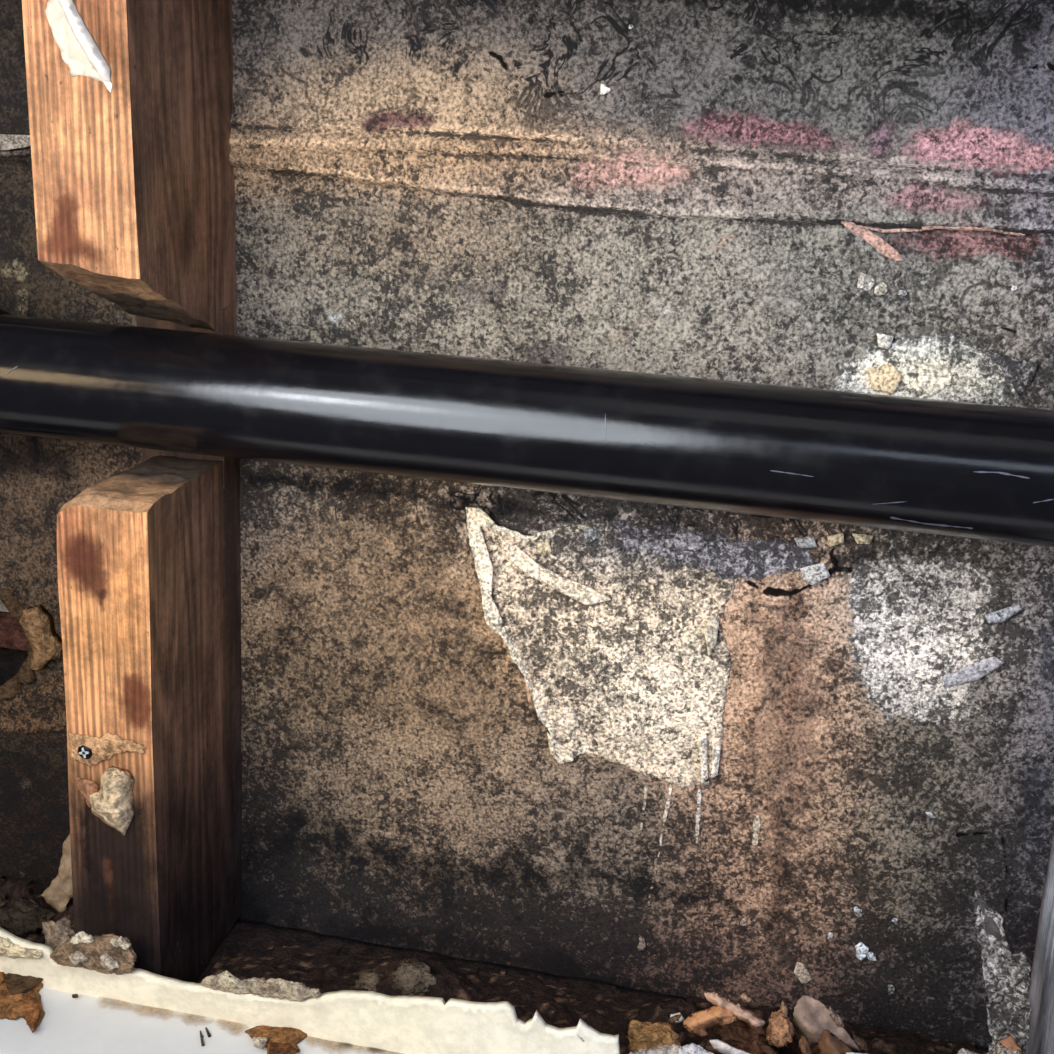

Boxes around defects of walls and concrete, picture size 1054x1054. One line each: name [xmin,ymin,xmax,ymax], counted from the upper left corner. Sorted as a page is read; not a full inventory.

peeling [2,259,30,316]
damp [65,536,106,604]
crack [746,547,854,597]
spalling [0,558,67,734]
peeling [466,507,873,788]
peeling [843,550,1022,728]
damp [752,815,761,845]